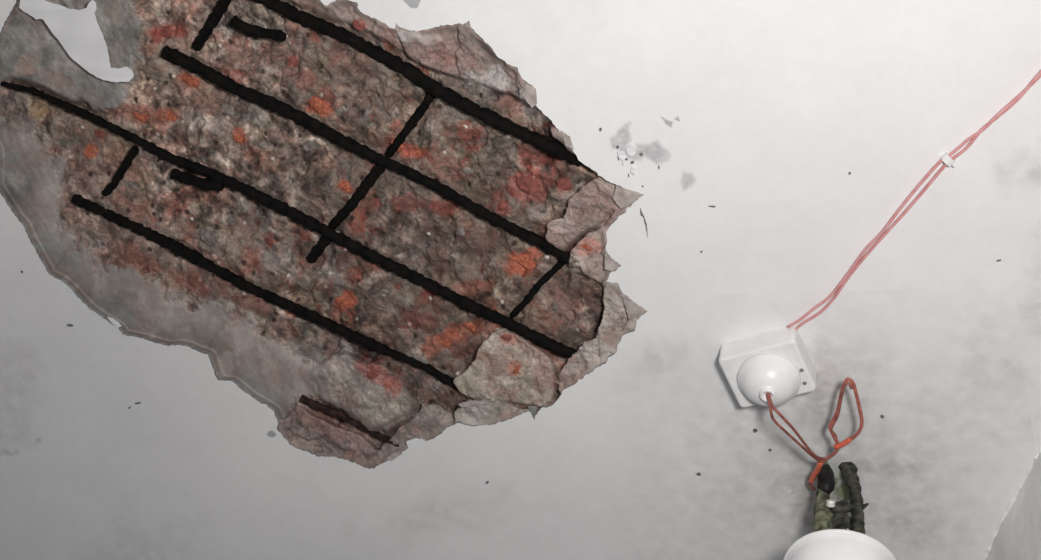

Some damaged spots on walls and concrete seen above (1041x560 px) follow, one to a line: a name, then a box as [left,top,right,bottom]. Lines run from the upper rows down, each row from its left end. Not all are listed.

spalling [0,0,660,468]